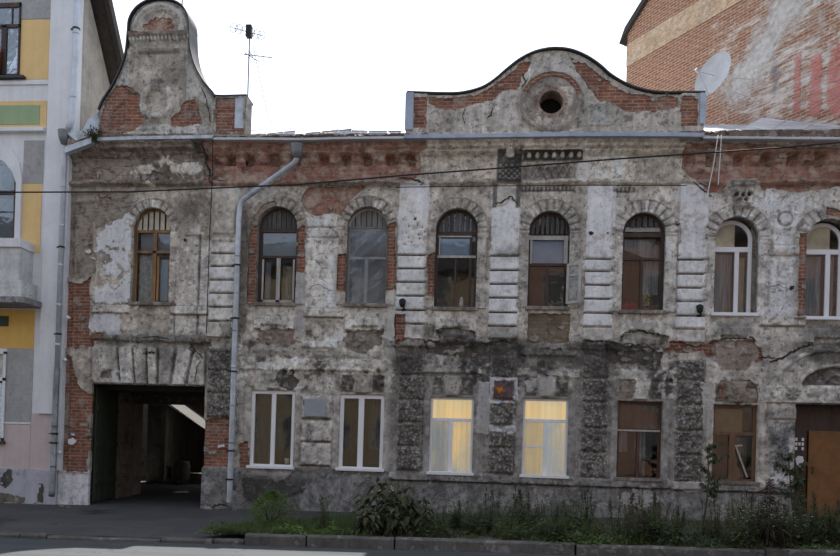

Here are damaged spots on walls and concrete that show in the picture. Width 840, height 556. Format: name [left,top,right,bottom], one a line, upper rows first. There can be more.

flaking render [101,86,144,134]
flaking render [169,58,700,216]
flaking render [63,150,139,472]
flaking render [343,328,384,354]
flaking render [394,314,406,345]
flaking render [527,313,571,344]
crack [719,336,814,363]
flaking render [275,369,300,390]
flaking render [581,334,763,405]
flaking render [203,417,229,467]
flaking render [239,441,249,468]
peeling [0,469,25,503]